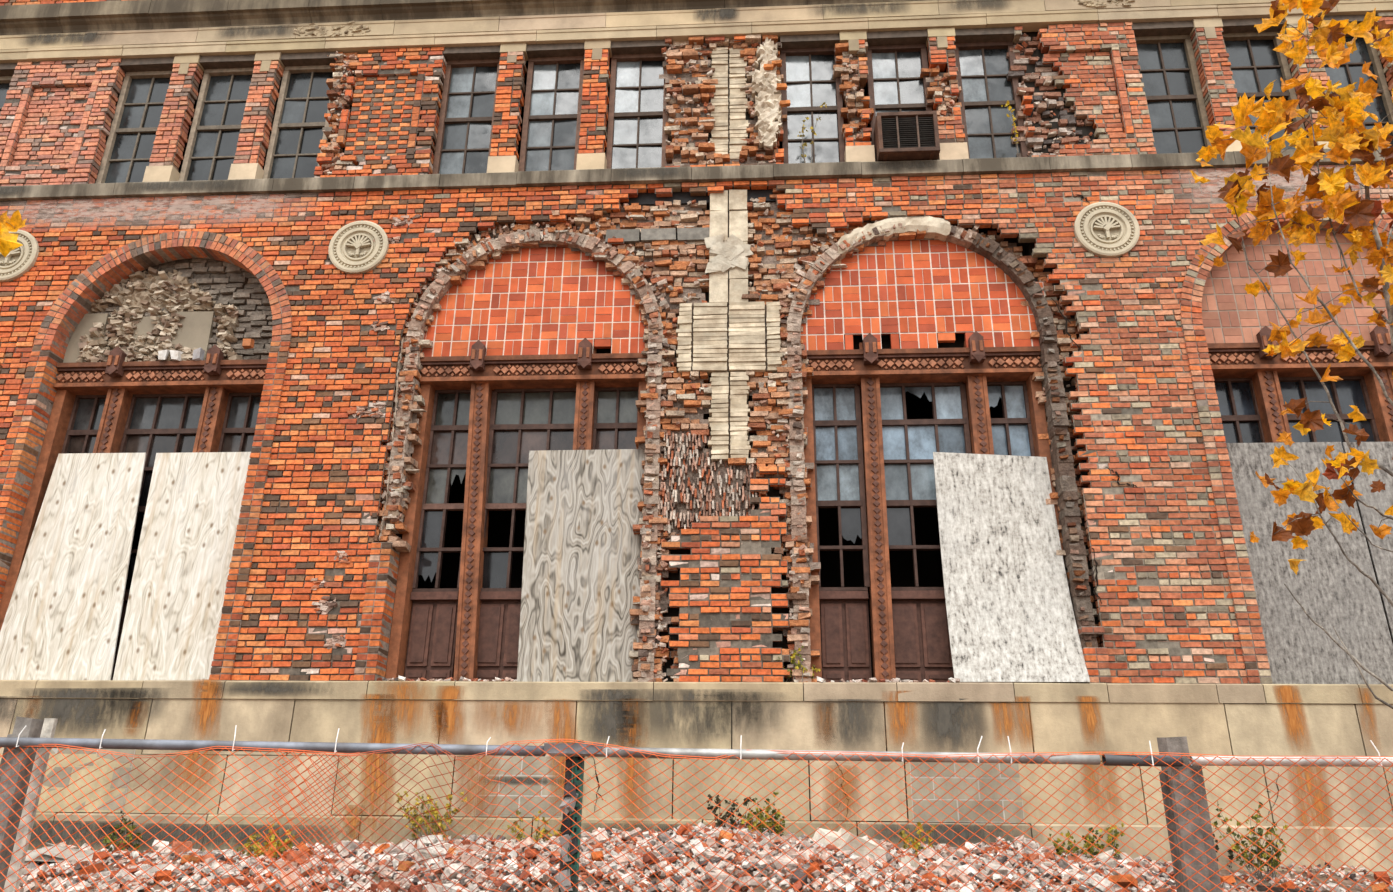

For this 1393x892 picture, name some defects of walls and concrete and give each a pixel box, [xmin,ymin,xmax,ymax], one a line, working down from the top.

spalling [293,21,371,175]
spalling [659,34,787,166]
spalling [1006,33,1093,157]
spalling [347,187,1101,698]
rust [196,679,220,734]
rust [346,682,462,840]
water stain [587,689,767,742]
rust [888,691,914,740]
rust [993,698,1032,740]
rust [1276,685,1306,743]